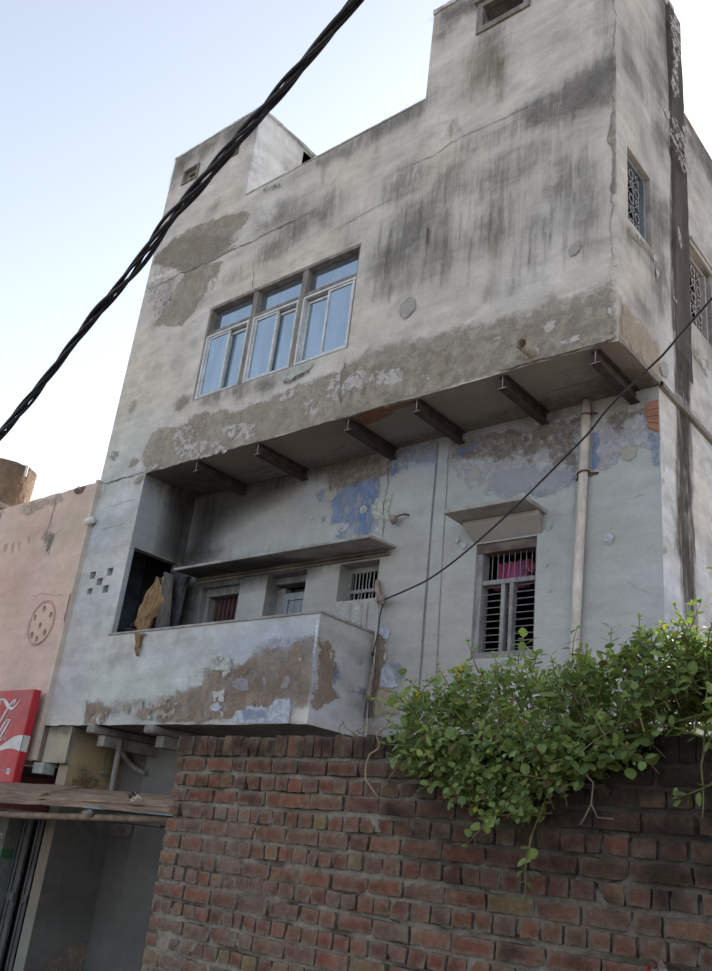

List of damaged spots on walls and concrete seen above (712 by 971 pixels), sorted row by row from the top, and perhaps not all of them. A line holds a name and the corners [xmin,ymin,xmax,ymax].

peeling [670,14,682,97]
peeling [664,108,695,176]
peeling [146,211,249,326]
peeling [129,363,405,484]
peeling [448,412,581,499]
spalling [497,334,663,386]
peeling [590,400,660,470]
water stain [661,170,698,626]
peeling [309,478,393,538]
peeling [82,634,341,725]